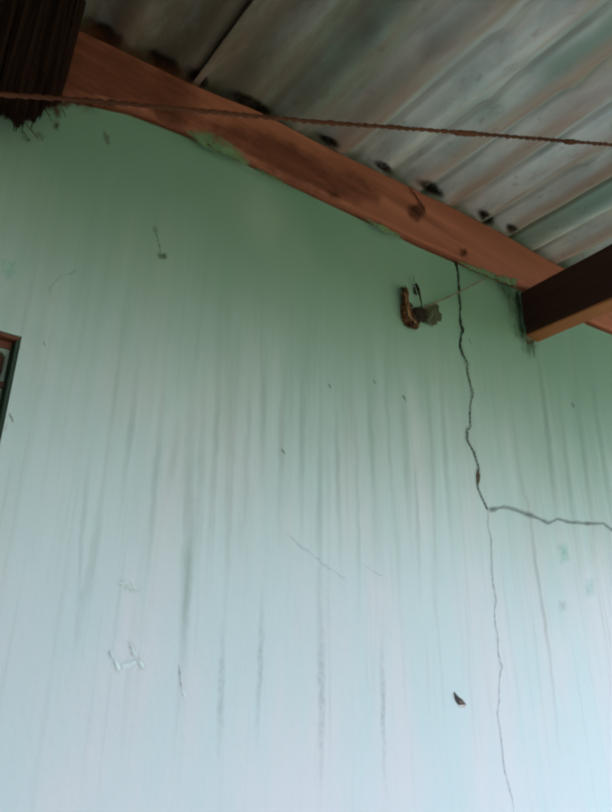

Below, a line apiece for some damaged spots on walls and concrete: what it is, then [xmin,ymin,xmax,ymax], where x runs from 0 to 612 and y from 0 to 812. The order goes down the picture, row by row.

crack [455,262,488,510]